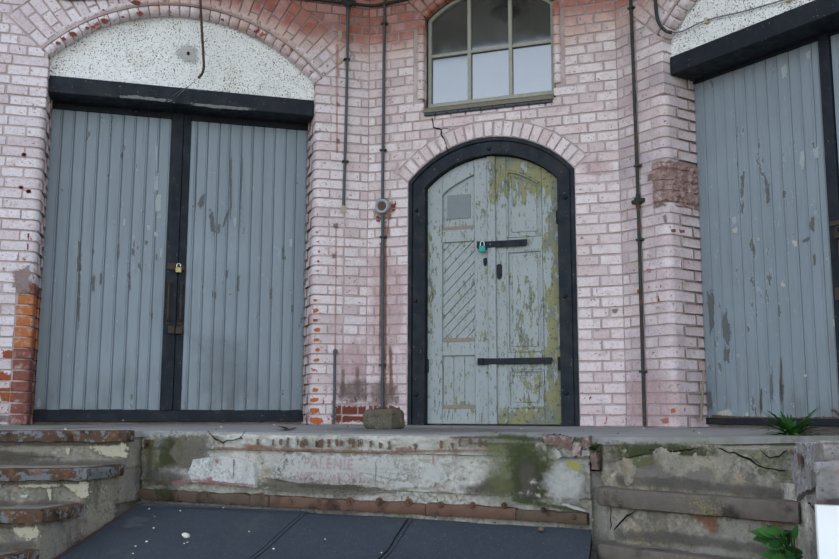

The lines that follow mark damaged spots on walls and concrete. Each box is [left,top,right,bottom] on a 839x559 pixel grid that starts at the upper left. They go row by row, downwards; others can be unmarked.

crack [432,118,450,155]
peeling [195,142,243,235]
spalling [648,160,700,233]
peeling [706,290,731,364]
peeling [707,392,734,416]
crack [194,424,245,444]
peeling [89,442,132,458]
peeling [167,431,448,495]
crack [650,447,788,471]
peeling [16,480,92,501]
leakage [466,477,512,494]
peeling [13,523,42,542]